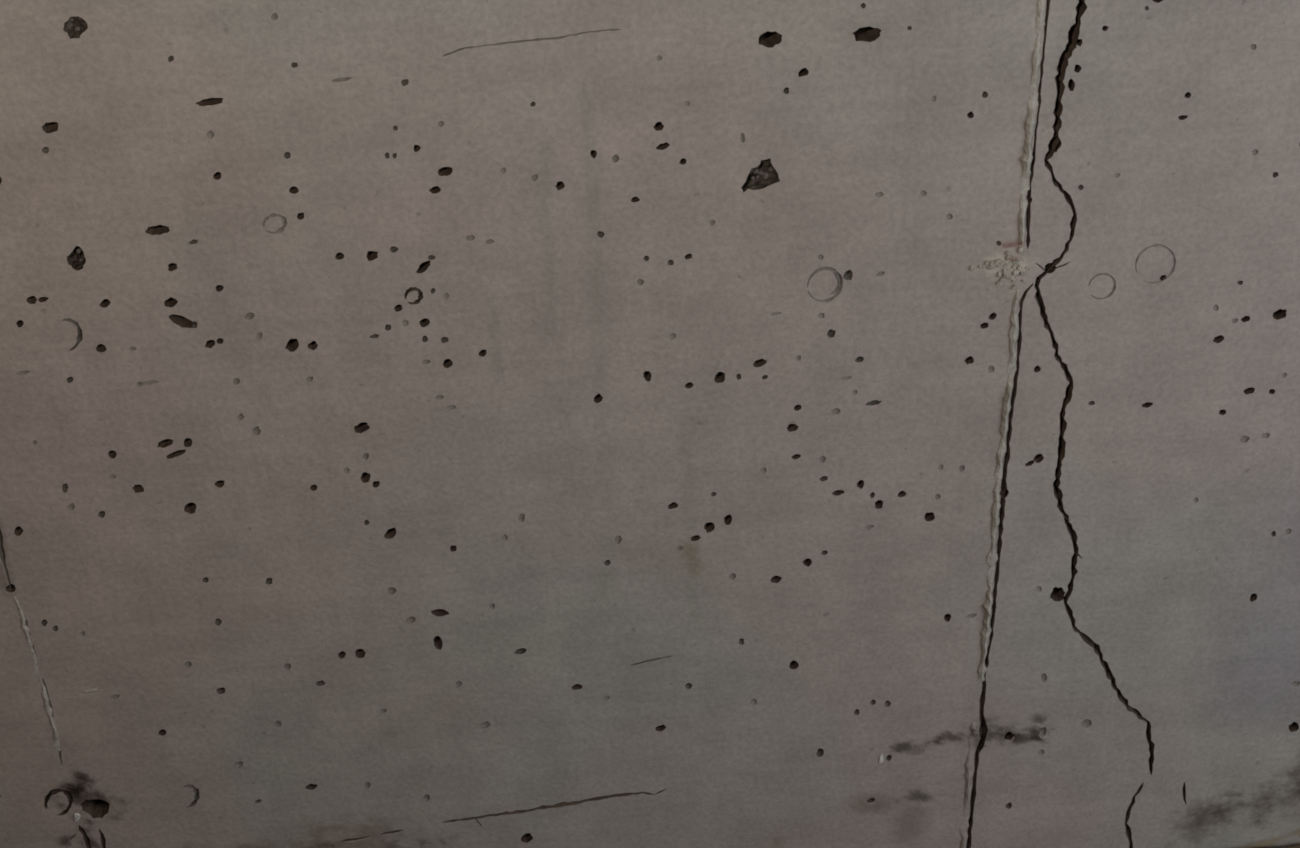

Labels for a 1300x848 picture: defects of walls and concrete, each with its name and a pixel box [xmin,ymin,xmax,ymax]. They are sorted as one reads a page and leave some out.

crack [1034,0,1155,848]
crack [1180,782,1188,805]
crack [70,826,106,848]